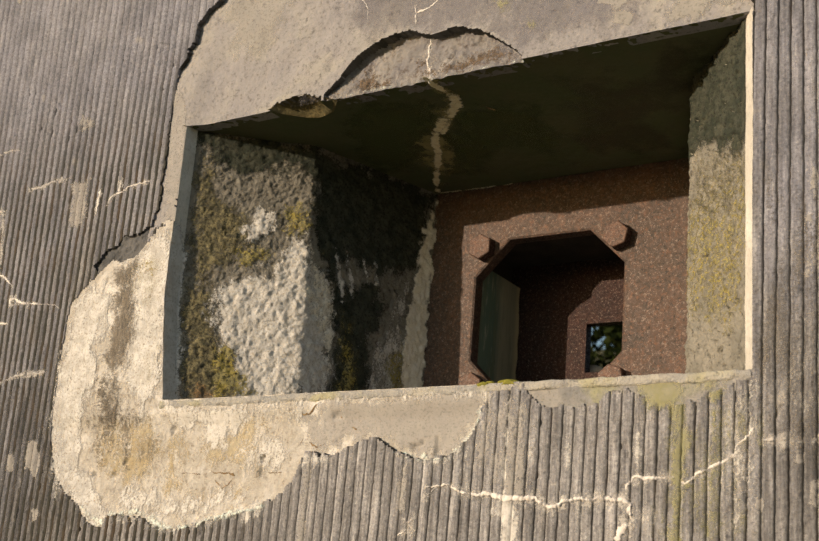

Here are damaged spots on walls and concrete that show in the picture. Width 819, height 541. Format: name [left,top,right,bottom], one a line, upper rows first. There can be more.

crack [413,0,438,26]
crack [29,176,67,193]
crack [94,177,151,215]
water stain [415,74,459,189]
spalling [173,0,755,158]
crack [422,40,513,193]
crack [0,370,45,384]
crack [0,209,58,326]
spalling [59,142,448,531]
water stain [120,92,532,541]
spalling [455,392,490,445]
crack [397,423,819,541]